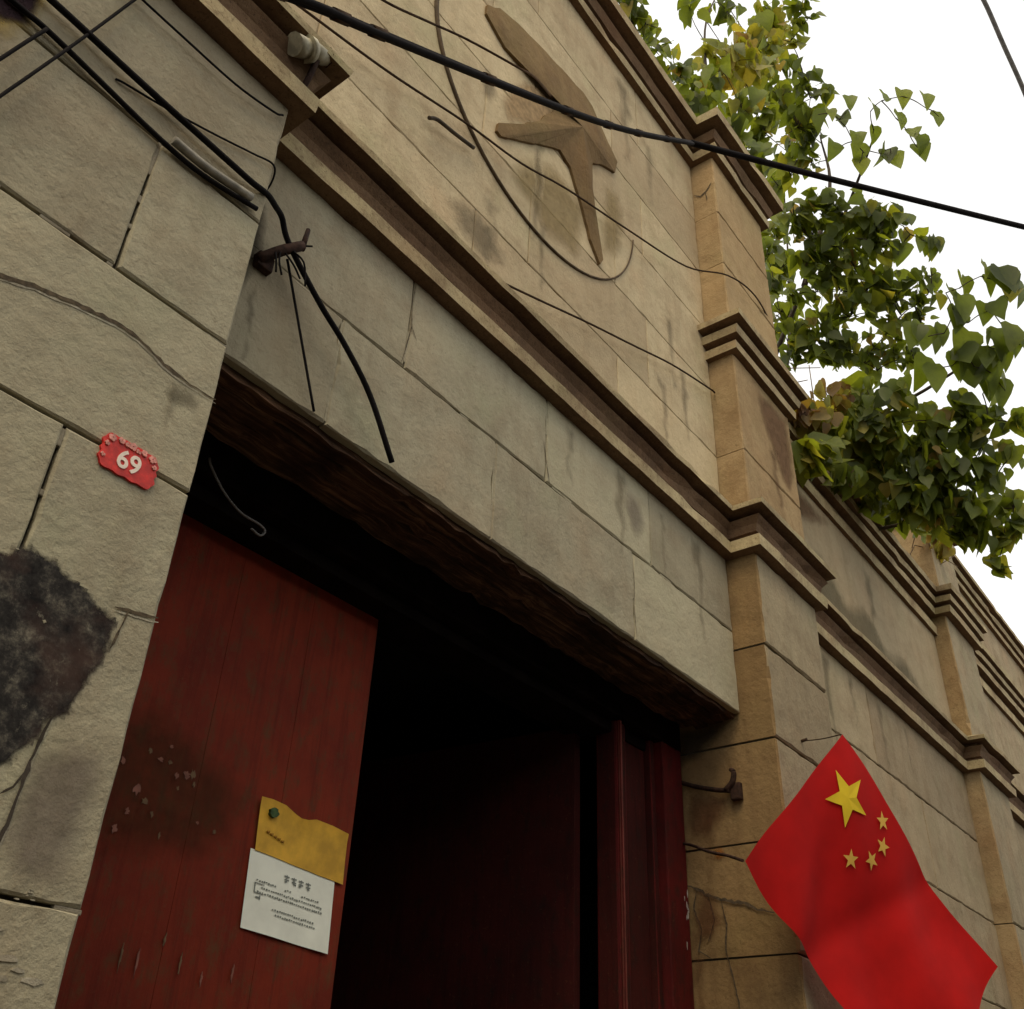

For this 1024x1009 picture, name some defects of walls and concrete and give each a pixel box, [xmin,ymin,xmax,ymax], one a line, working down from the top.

crack [0,273,216,404]
crack [0,707,57,846]
crack [688,885,775,1009]